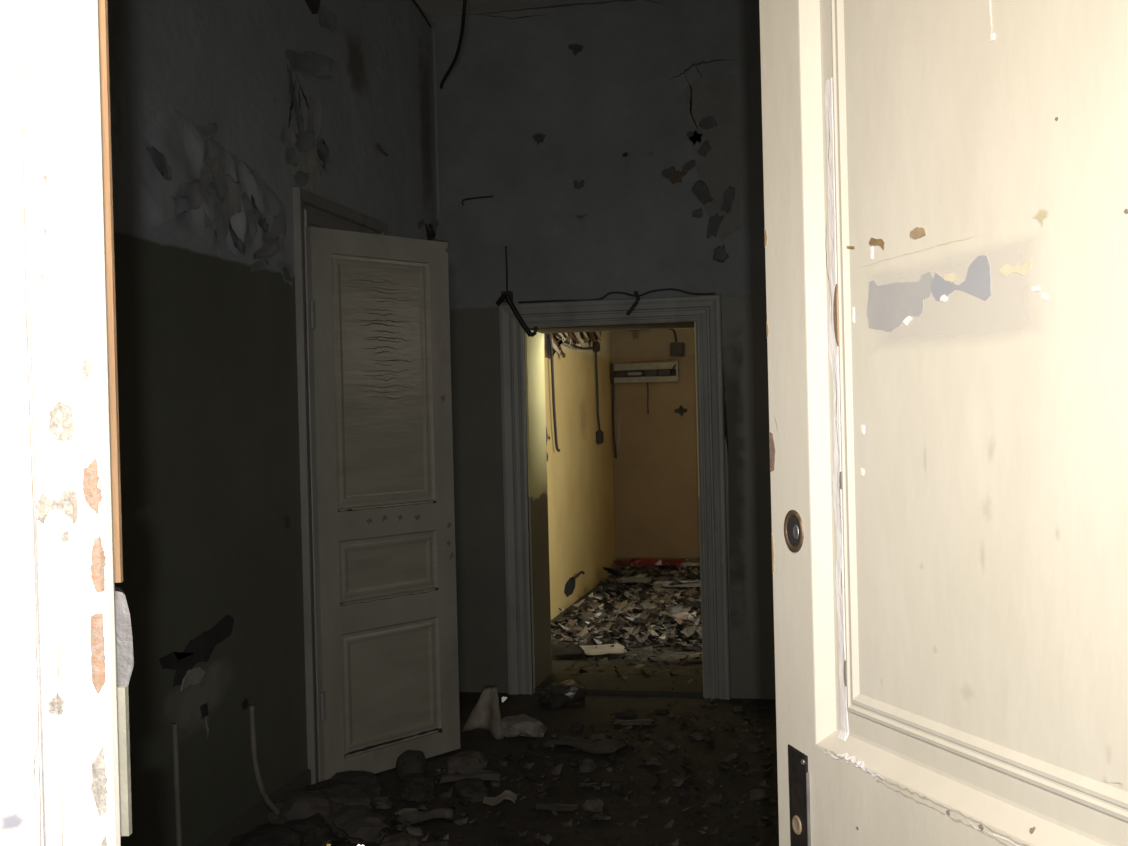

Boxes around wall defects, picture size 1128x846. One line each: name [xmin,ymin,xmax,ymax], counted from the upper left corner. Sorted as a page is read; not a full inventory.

peeling [661,72,742,263]
peeling [867,255,992,332]
peeling [47,401,75,441]
peeling [36,458,102,542]
peeling [90,537,106,593]
peeling [90,613,106,693]
peeling [91,746,108,817]